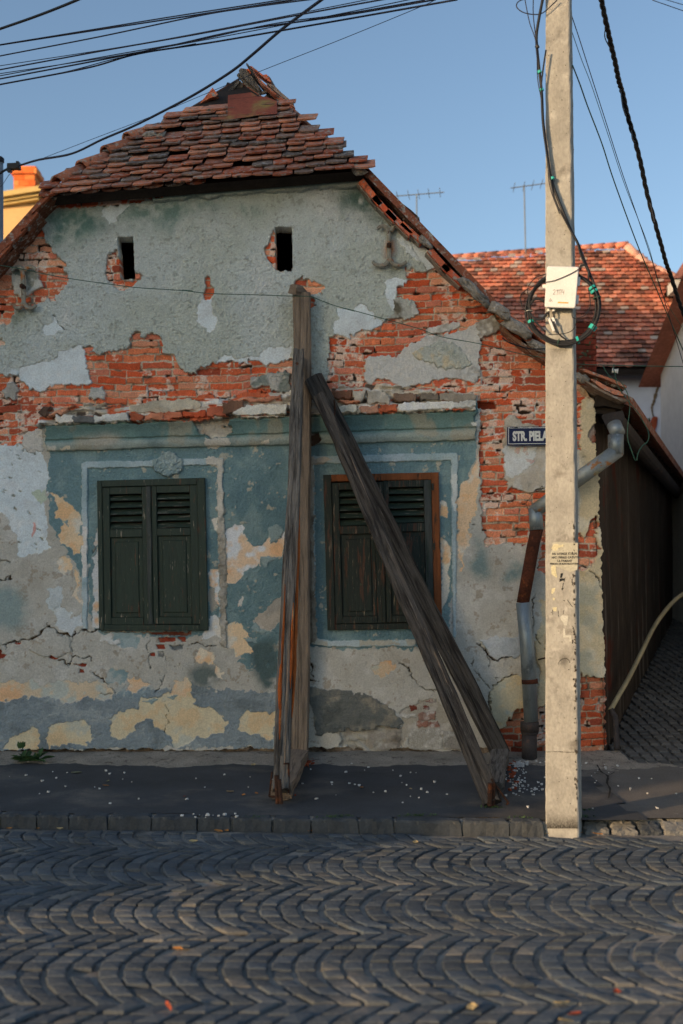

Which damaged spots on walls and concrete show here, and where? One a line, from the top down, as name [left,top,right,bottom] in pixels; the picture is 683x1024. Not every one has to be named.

spalling [0,231,69,325]
spalling [106,251,142,291]
spalling [265,232,325,308]
spalling [0,333,293,678]
spalling [308,236,607,811]
rust [517,529,543,603]
crack [5,626,97,664]
peeling [0,663,275,752]